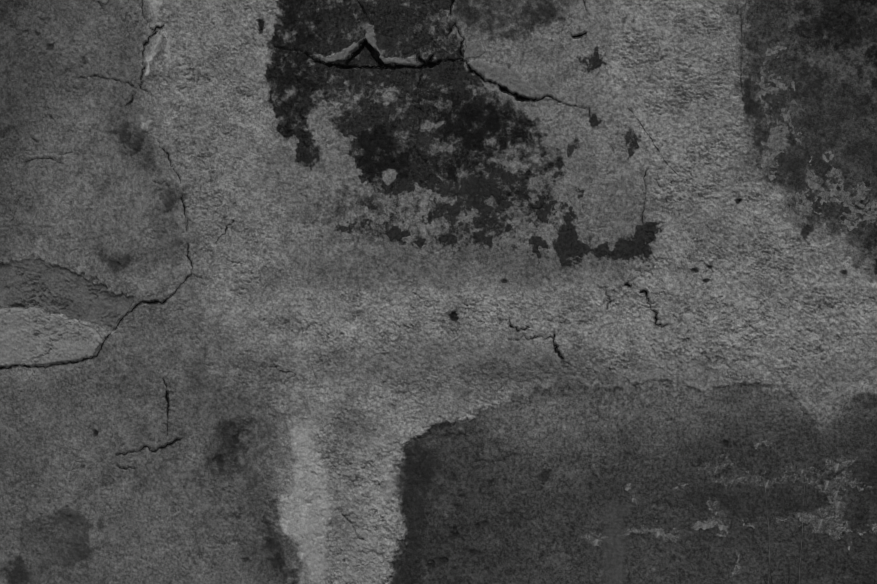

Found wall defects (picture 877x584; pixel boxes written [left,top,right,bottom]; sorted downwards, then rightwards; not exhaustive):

crack [78,5,168,107]
leakage [265,0,563,221]
crack [274,0,591,181]
leakage [742,64,827,146]
leakage [757,0,877,87]
crack [0,142,202,369]
crack [114,379,182,469]
leakage [263,424,332,584]